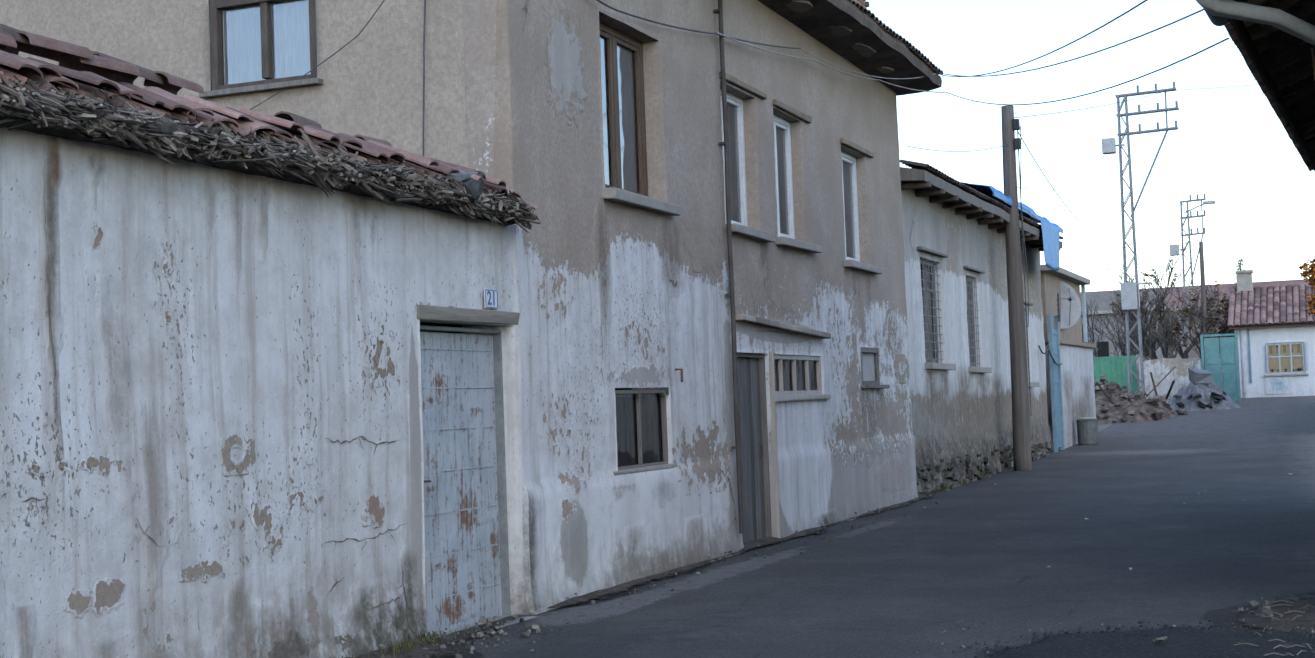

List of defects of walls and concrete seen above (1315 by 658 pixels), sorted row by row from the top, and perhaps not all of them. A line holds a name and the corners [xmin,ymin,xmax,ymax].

damp [39,134,66,563]
spalling [363,320,396,395]
spalling [597,312,675,388]
spalling [726,237,1013,484]
spalling [26,455,140,478]
spalling [220,434,256,476]
spalling [179,472,324,583]
crack [325,436,400,454]
spalling [362,493,385,528]
corrosion [422,355,499,631]
spalling [672,418,737,496]
spalling [64,576,127,619]